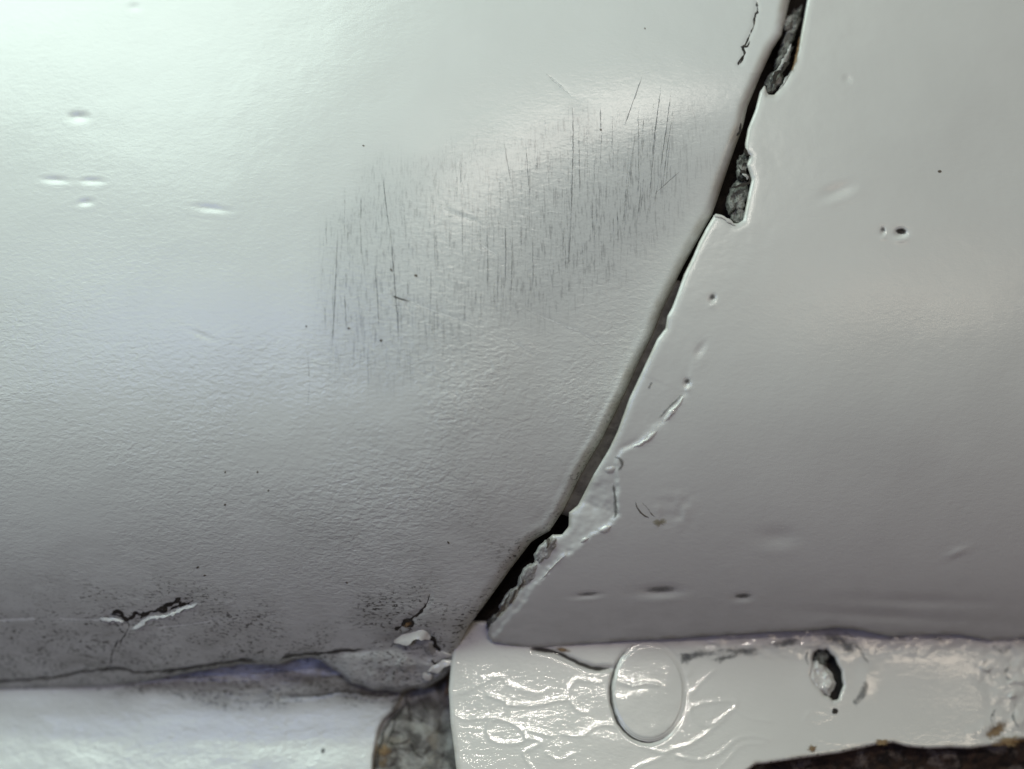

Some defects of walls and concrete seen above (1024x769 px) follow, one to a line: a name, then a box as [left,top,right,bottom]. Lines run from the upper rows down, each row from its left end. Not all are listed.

crack [738,2,759,65]
peeling [633,375,694,447]
spalling [486,534,566,630]
spalling [394,595,452,681]
spalling [813,650,843,700]